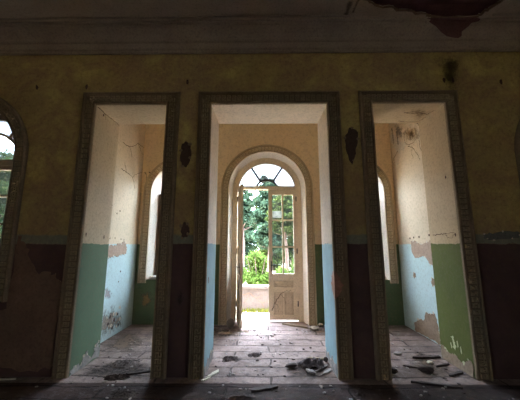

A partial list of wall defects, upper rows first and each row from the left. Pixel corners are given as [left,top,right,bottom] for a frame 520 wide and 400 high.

flaking render [344,127,359,164]
peeling [108,241,127,259]
peeling [410,240,433,265]
peeling [101,306,121,334]
flaking render [414,311,474,378]